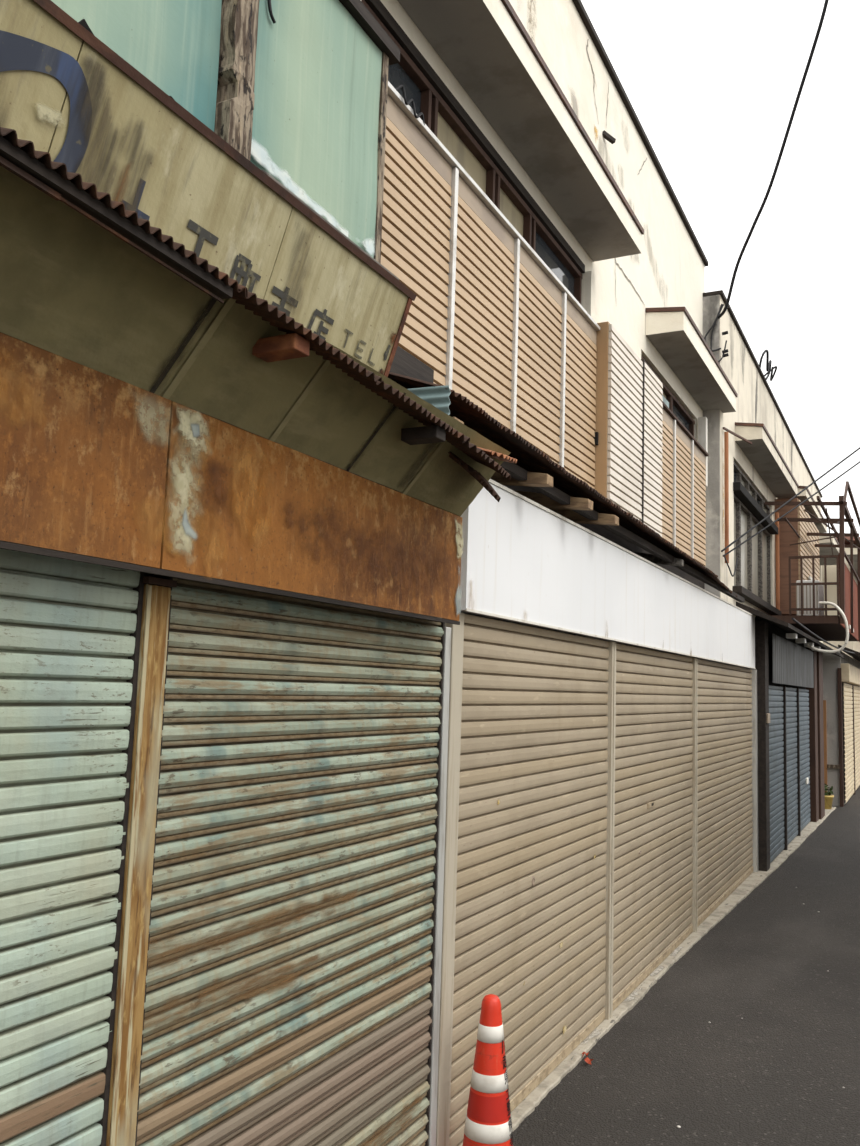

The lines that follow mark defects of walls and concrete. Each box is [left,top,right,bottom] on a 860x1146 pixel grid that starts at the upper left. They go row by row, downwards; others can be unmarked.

crack [587,39,609,126]
peeling [167,409,211,552]